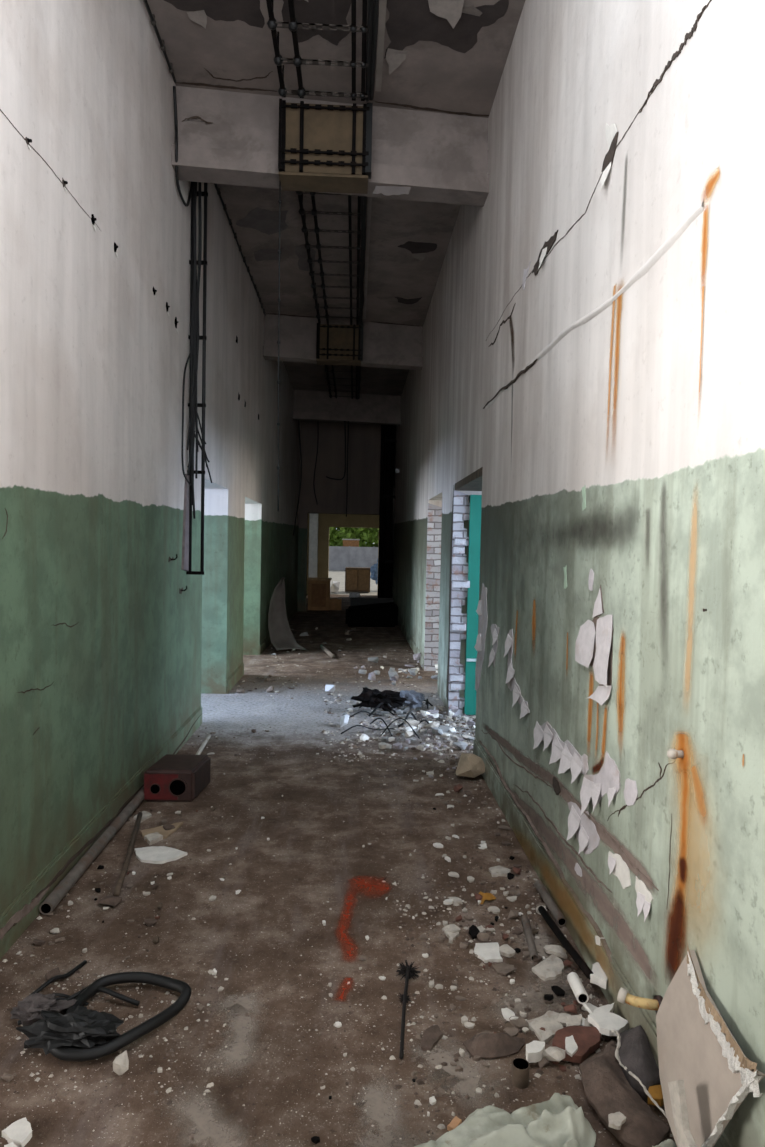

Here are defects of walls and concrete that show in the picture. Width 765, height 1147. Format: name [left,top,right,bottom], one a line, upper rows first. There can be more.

peeling [164,0,265,29]
peeling [384,0,509,75]
crack [0,109,99,228]
crack [486,0,712,347]
corrosion [699,169,720,394]
corrosion [607,285,622,423]
flaking render [424,488,659,980]
corrosion [587,635,625,773]
crack [607,759,676,821]
crack [665,813,673,905]
corrosion [665,733,707,981]